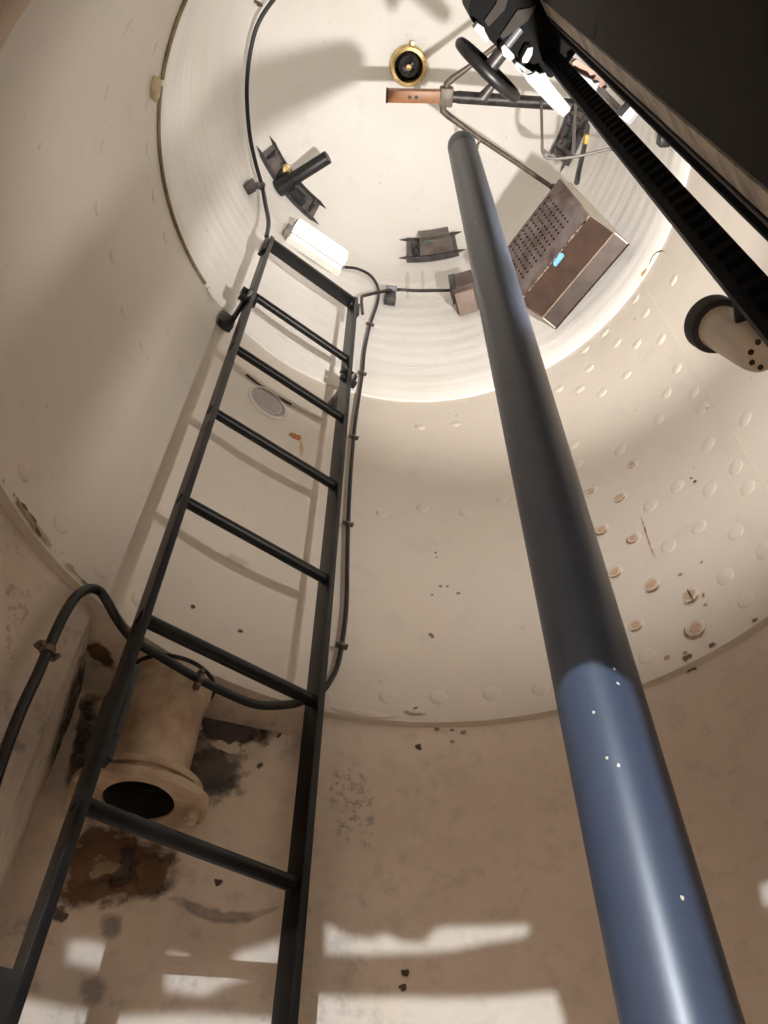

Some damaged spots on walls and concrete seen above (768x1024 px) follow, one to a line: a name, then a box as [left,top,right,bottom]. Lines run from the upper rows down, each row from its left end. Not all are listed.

rust [683,624,706,639]
damp [50,643,114,783]
damp [190,717,282,795]